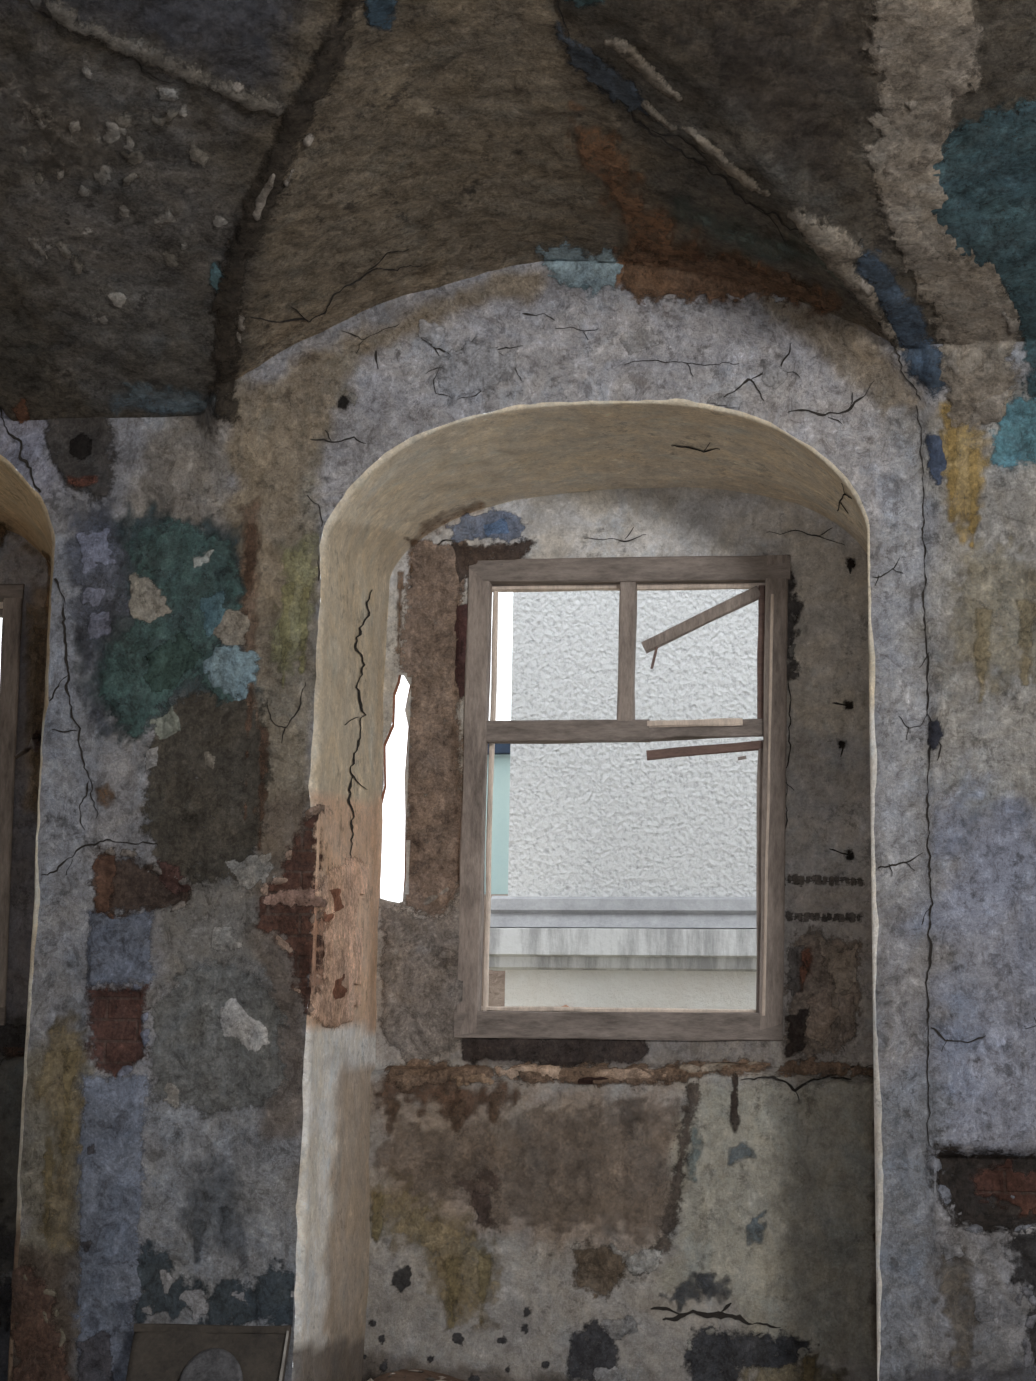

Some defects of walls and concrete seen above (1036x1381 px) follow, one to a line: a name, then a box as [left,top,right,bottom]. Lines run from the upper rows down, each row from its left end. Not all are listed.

flaking render [604,37,771,197]
crack [597,86,805,243]
flaking render [786,0,1036,485]
crack [250,249,597,399]
peeling [0,0,398,1381]
crack [627,322,986,1147]
flaking render [377,507,874,1298]
water stain [0,1200,16,1331]
flaking render [567,1315,638,1381]
crack [651,1303,781,1328]
flaking render [684,1326,820,1381]
flaking render [926,1140,1036,1368]